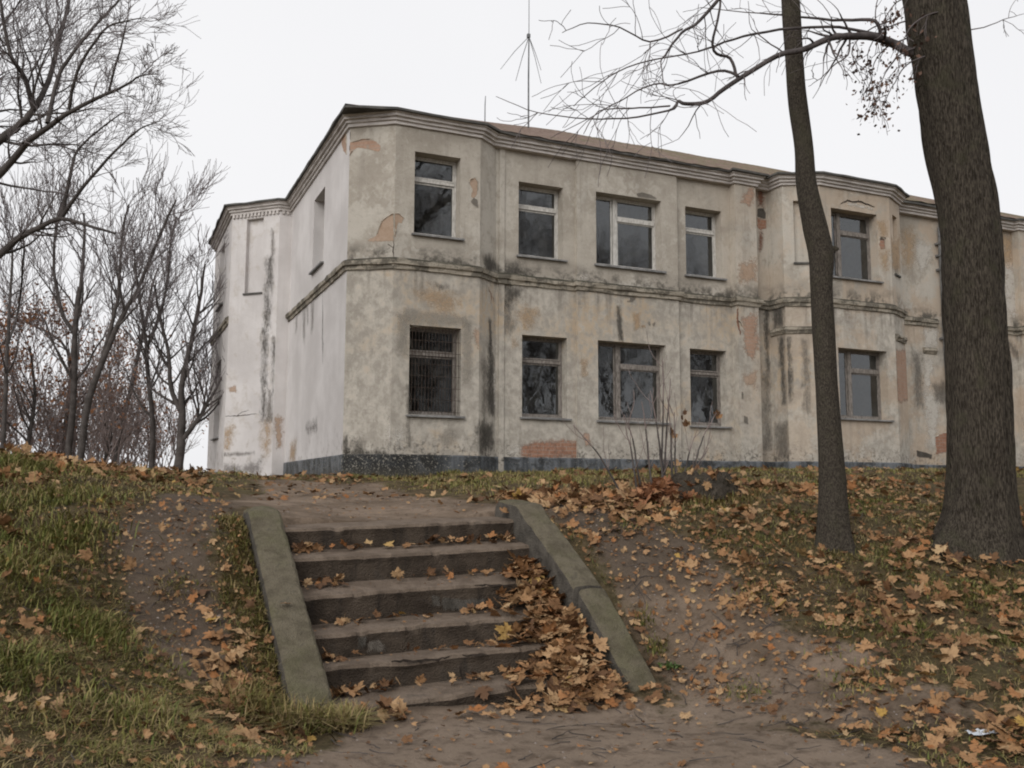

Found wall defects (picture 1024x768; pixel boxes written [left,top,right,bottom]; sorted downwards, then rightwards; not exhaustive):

flaking render [342,133,380,156]
flaking render [368,213,405,242]
leakage [262,235,275,356]
leakage [764,307,793,403]
leakage [476,320,495,452]
peeling [896,349,908,403]
flaking render [510,433,590,458]
leakage [765,423,787,458]
flaking render [917,432,946,459]